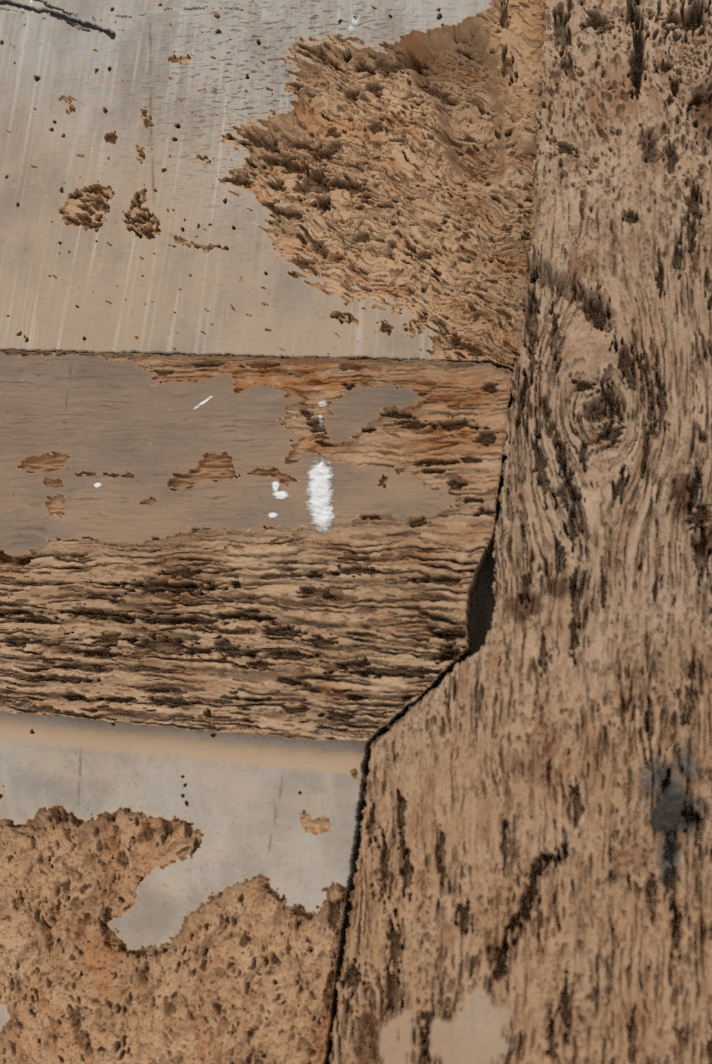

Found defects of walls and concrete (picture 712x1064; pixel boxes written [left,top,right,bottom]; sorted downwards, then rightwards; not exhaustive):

crack [0,0,248,41]
spalling [0,0,562,755]
spalling [0,759,353,1064]